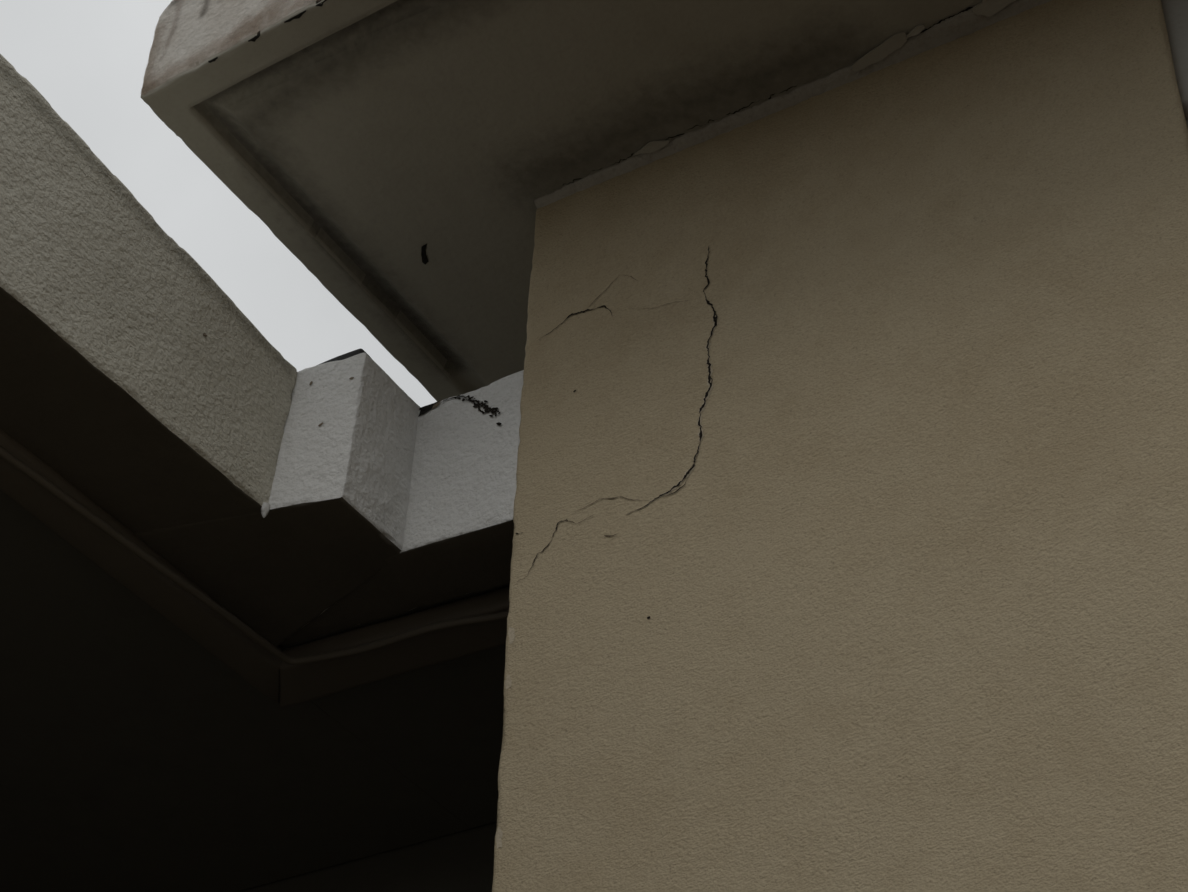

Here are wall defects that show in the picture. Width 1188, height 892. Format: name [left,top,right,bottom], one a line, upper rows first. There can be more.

crack [516,247,718,580]